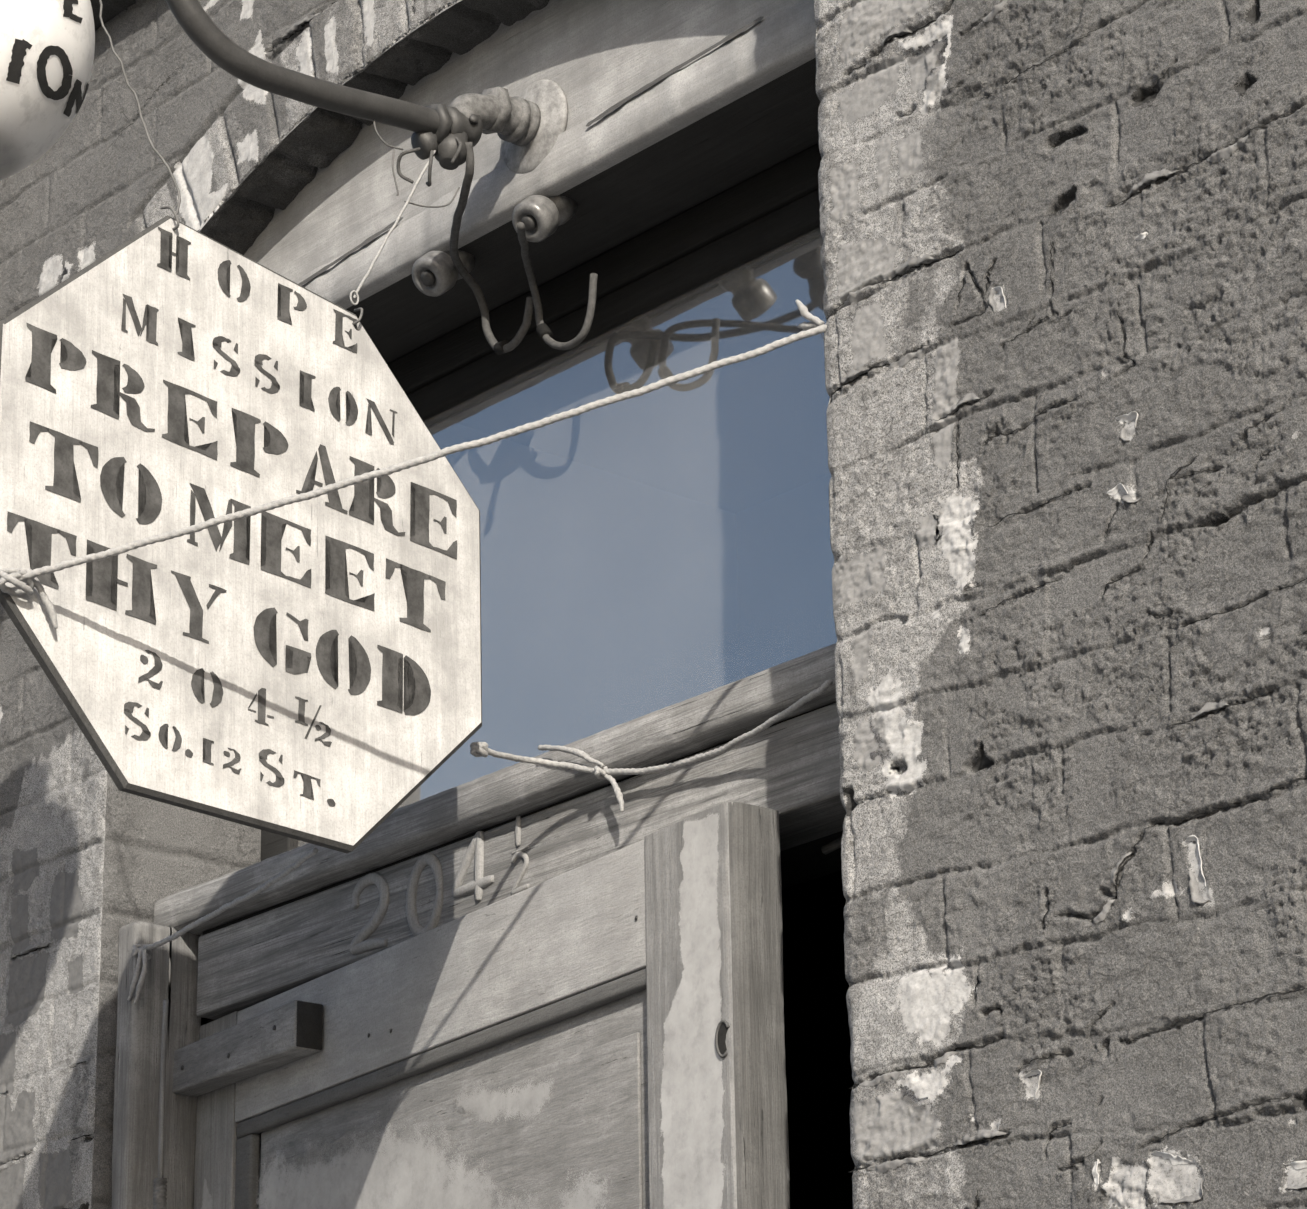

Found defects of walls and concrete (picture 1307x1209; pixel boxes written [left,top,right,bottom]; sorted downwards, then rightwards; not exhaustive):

peeling [835,0,944,124]
peeling [1107,483,1141,506]
crack [1103,456,1218,595]
crack [1043,778,1307,927]
peeling [1150,835,1216,908]
peeling [1092,1145,1204,1209]
peeling [1278,1158,1307,1193]